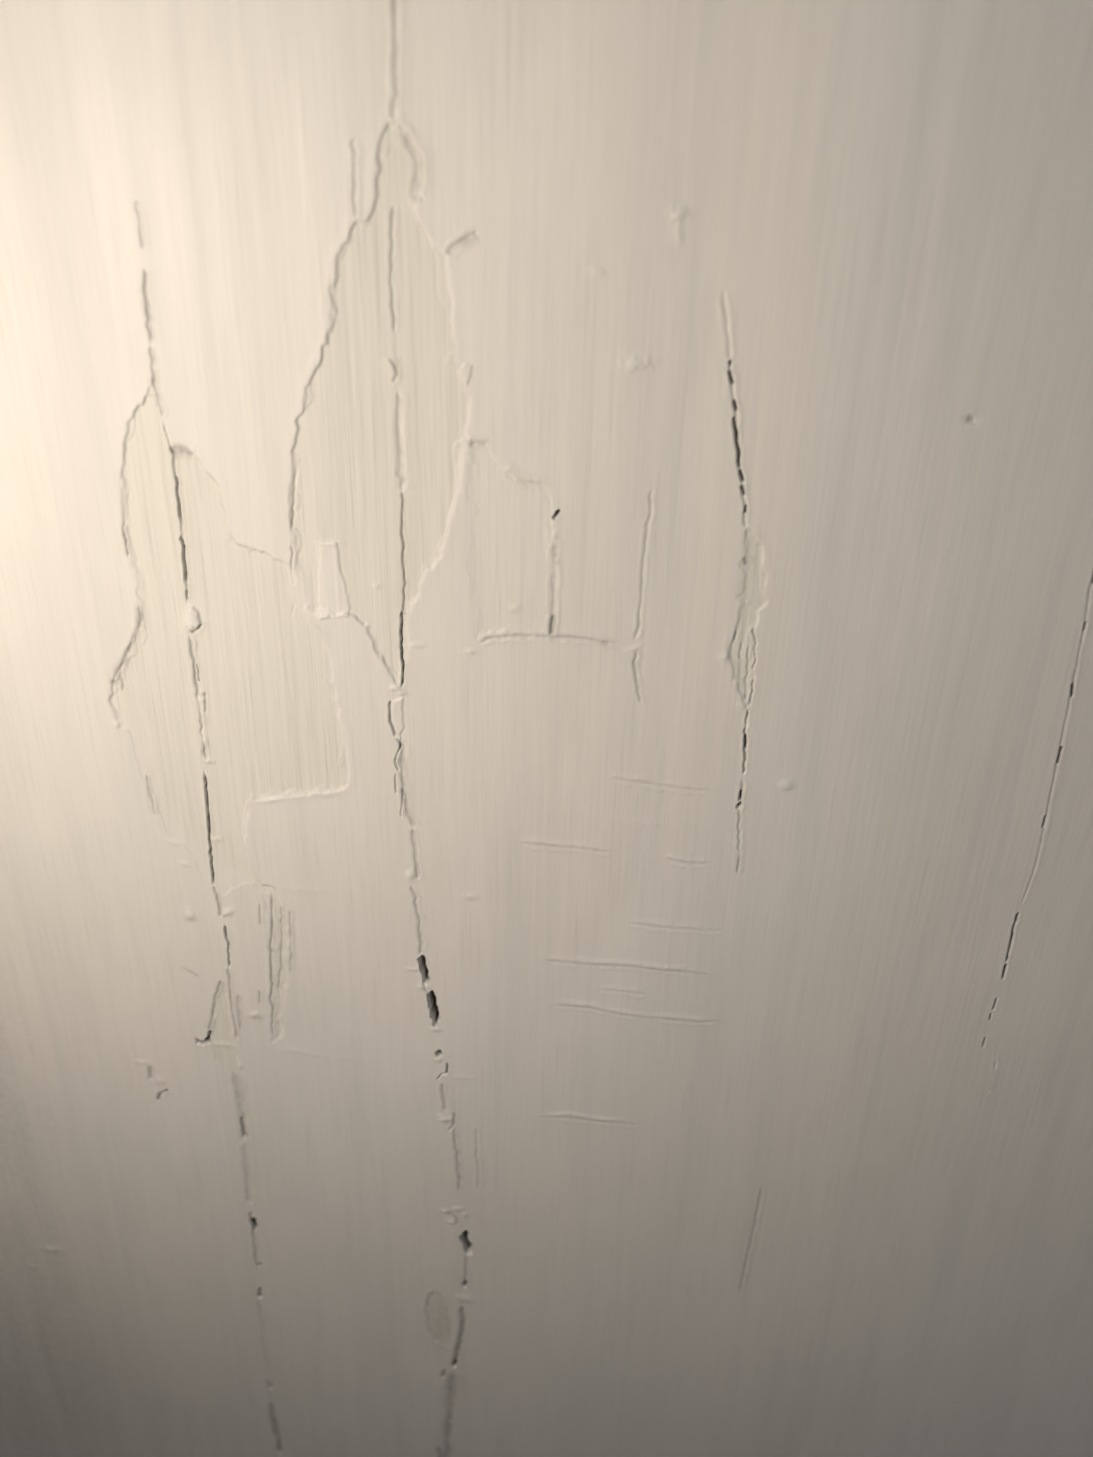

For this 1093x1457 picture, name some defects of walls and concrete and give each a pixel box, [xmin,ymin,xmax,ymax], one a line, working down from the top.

crack [388,0,405,125]
crack [719,282,752,532]
crack [547,507,564,642]
crack [131,193,284,1457]
crack [384,195,483,1457]
crack [734,702,754,879]
crack [979,564,1093,1097]